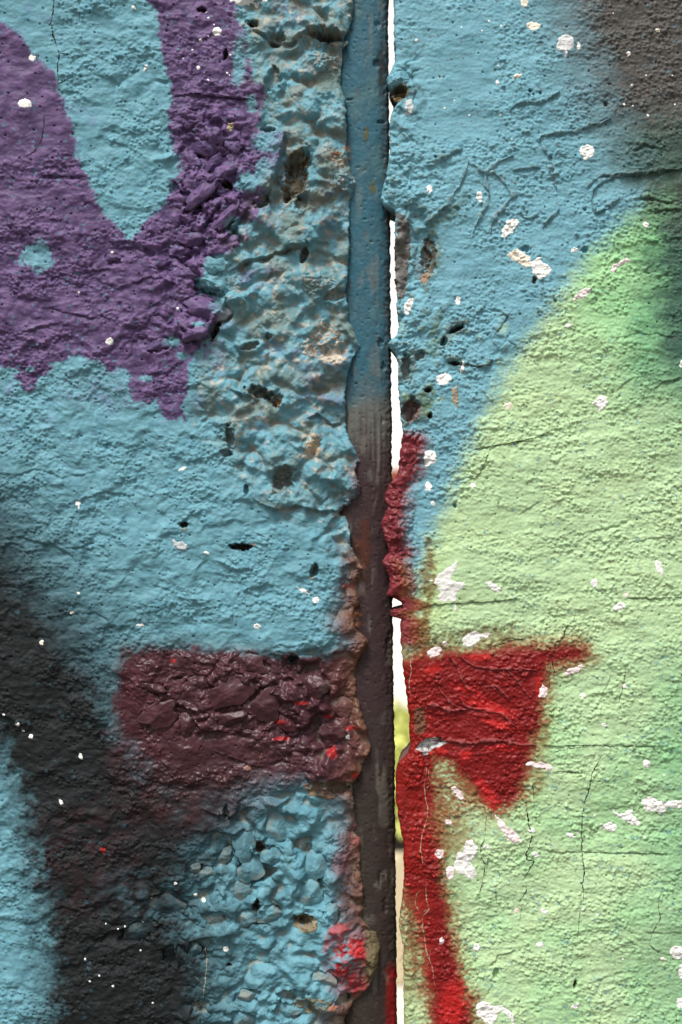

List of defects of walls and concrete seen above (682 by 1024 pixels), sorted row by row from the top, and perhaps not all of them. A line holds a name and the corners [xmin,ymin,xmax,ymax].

spalling [394,213,437,299]
crack [415,759,438,994]
crack [478,745,674,940]